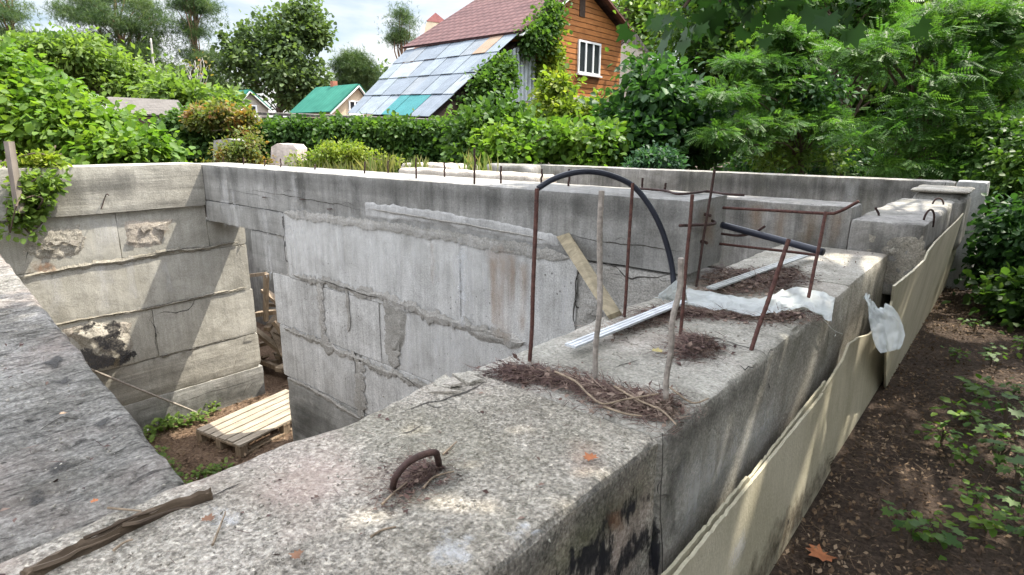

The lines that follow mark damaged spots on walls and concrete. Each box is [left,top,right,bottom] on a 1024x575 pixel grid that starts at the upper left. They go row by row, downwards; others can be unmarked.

spalling [23,224,86,259]
spalling [124,219,173,248]
spalling [62,320,132,344]
water stain [556,490,661,575]